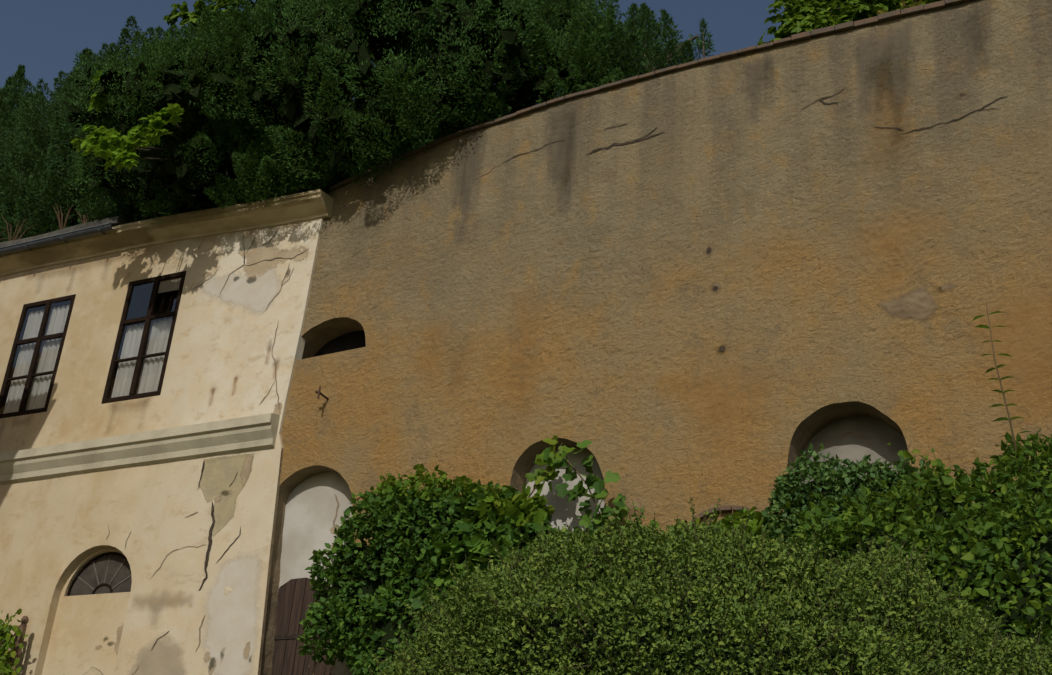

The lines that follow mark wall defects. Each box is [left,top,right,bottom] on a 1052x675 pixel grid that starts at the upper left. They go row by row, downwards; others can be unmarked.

crack [586,123,663,155]
crack [877,96,1007,134]
flaking render [239,246,308,279]
crack [195,231,307,412]
flaking render [195,454,254,536]
crack [150,500,241,590]